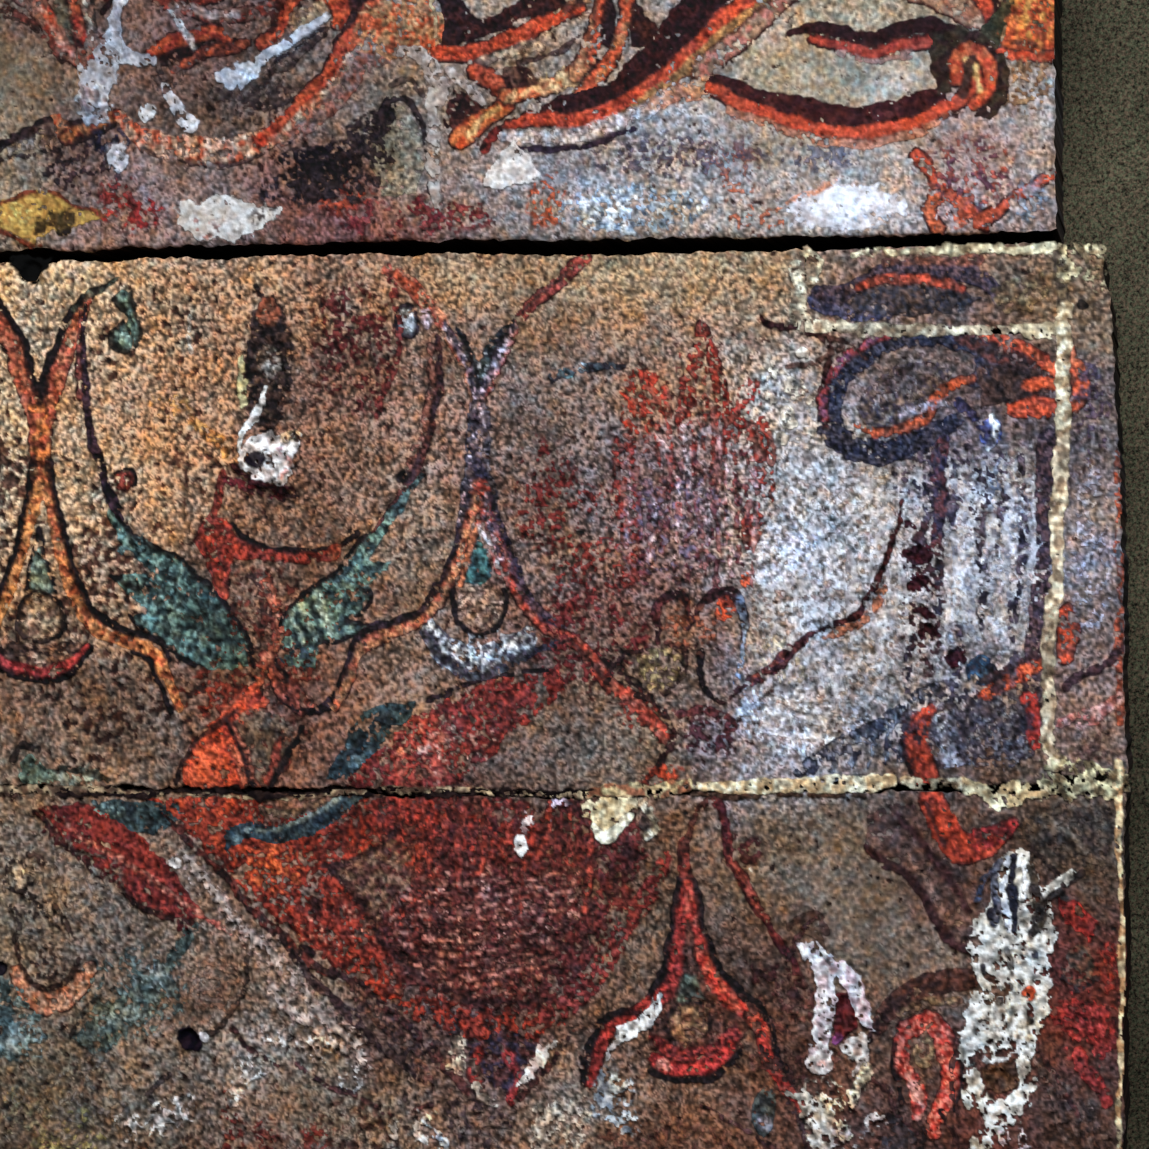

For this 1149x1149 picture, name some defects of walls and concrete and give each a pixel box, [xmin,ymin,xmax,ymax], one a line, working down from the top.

crack [0,791,21,799]
crack [56,784,593,803]
crack [690,791,867,801]
peeling [168,853,374,1091]
peeling [223,1054,269,1107]
peeling [111,1094,195,1142]
peeling [389,1112,449,1149]